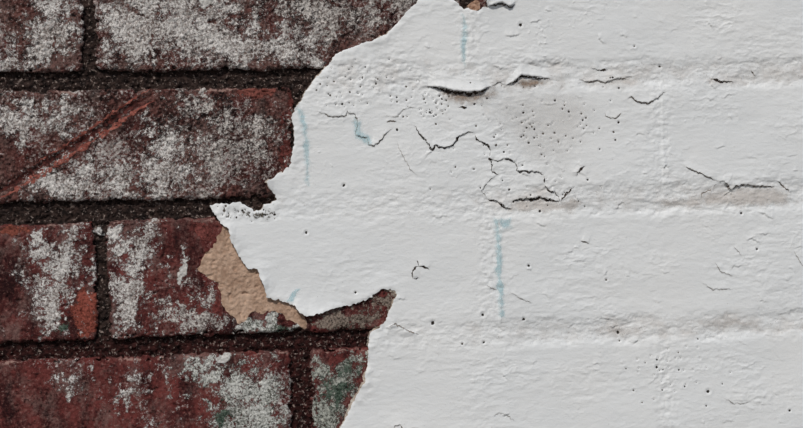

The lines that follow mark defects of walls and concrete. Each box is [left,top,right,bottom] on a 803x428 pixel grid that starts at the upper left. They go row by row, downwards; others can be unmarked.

damp [95,0,417,72]
peeling [489,0,516,8]
damp [0,87,306,202]
spalling [237,88,294,167]
crack [324,107,585,209]
peeling [419,64,550,125]
crack [687,167,789,197]
damp [12,222,96,341]
spalling [70,287,98,339]
damp [106,218,299,339]
peeling [197,205,307,330]
damp [110,352,292,428]